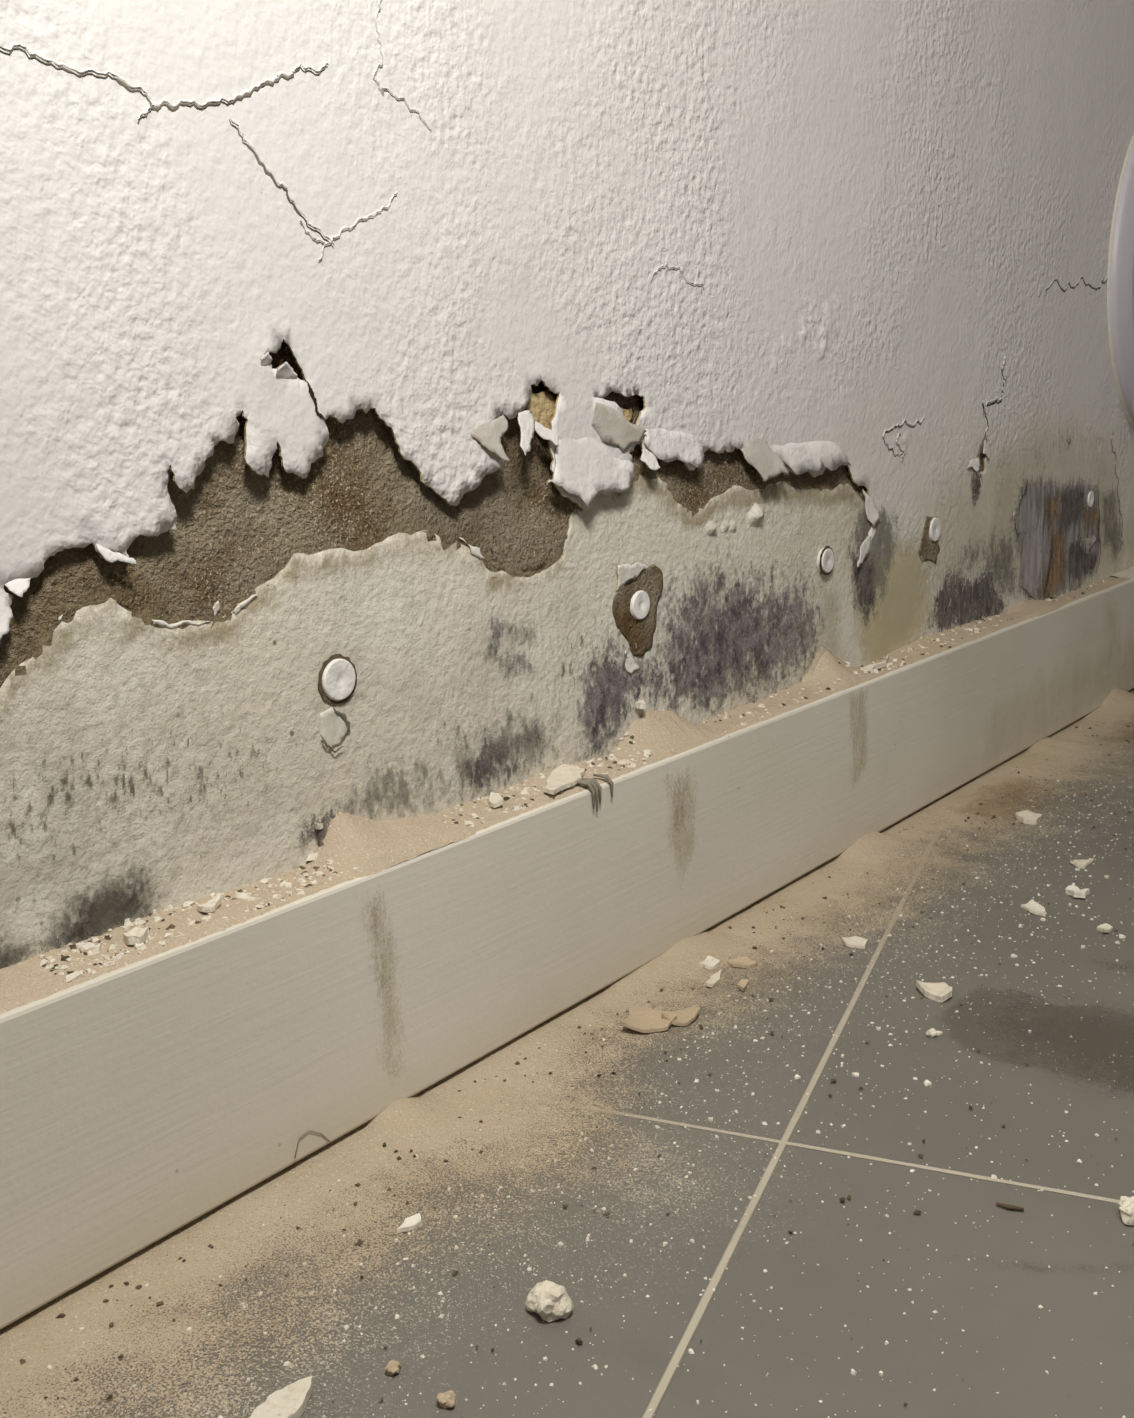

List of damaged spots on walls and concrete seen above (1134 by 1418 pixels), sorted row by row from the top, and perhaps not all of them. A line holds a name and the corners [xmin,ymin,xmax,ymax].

crack [373,0,432,131]
crack [0,44,397,261]
flaking render [260,341,304,380]
spalling [0,384,881,687]
spalling [918,516,940,564]
mould [486,557,825,761]
mould [8,730,189,864]
mould [299,712,558,850]
spalling [544,764,585,795]
mould [0,945,28,969]
mould [45,869,152,949]
spalling [916,980,952,1003]